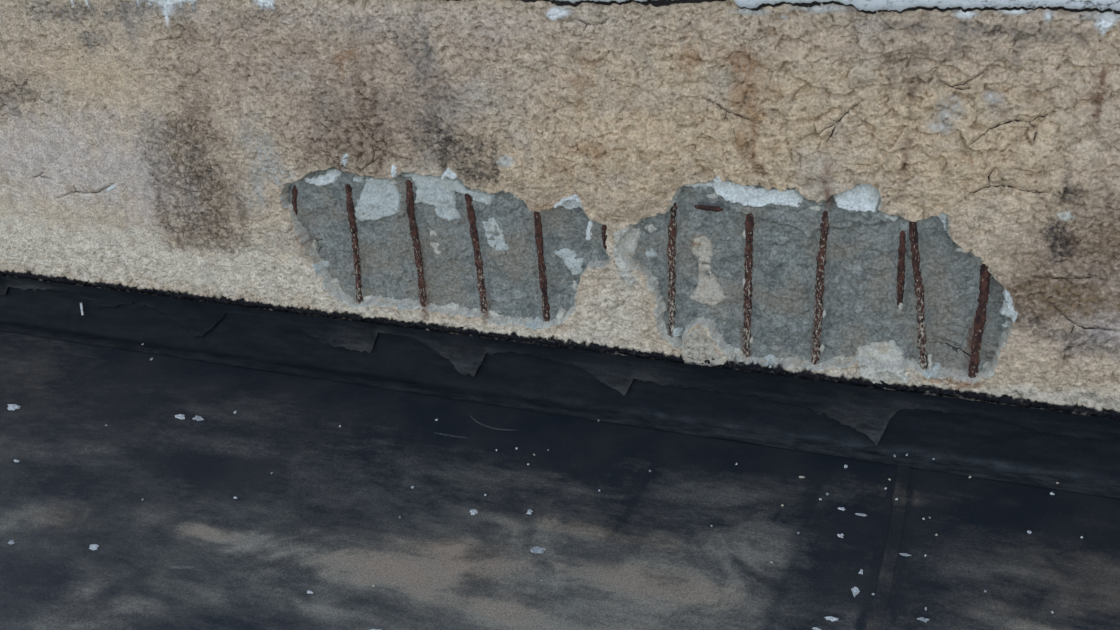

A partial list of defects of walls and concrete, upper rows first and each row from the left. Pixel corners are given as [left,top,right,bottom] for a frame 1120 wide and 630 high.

rust [345,184,363,304]
rust [406,180,427,307]
rust [464,193,488,313]
rust [534,211,550,322]
spalling [279,153,1018,385]
rust [667,202,678,338]
rust [742,213,754,358]
rust [811,211,829,365]
rust [896,221,933,382]
rust [948,264,991,387]
leakage [1046,225,1081,258]